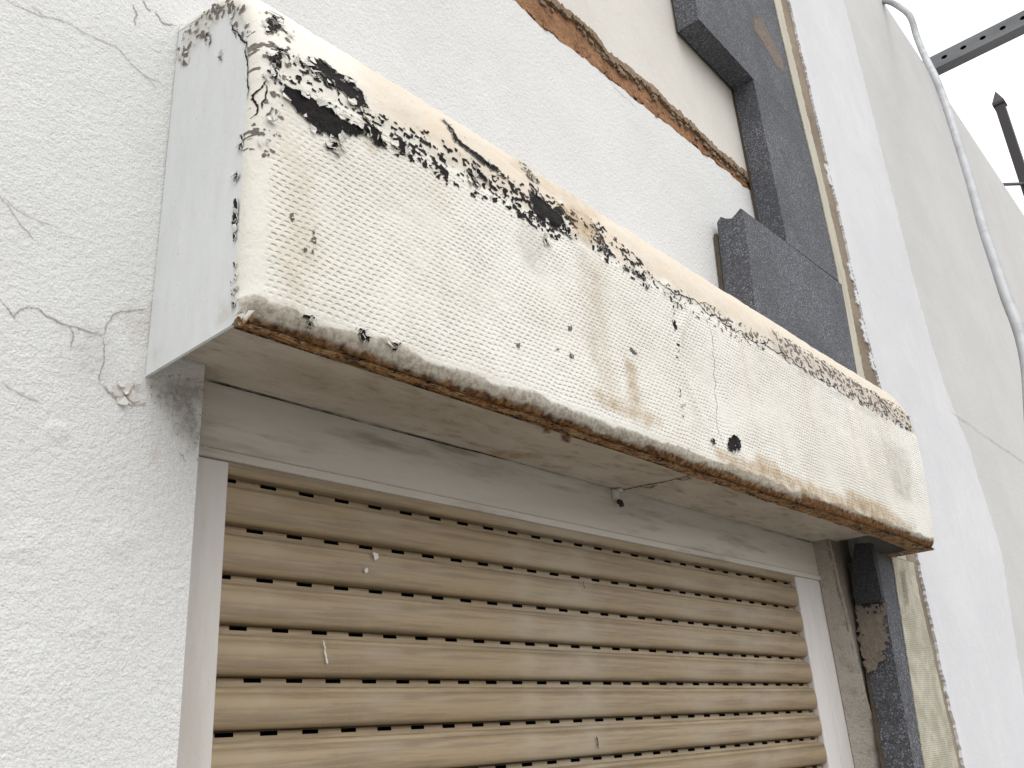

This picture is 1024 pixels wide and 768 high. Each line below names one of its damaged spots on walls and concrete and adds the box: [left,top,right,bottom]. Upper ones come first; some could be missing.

crack [0,196,51,240]
peeling [177,0,911,431]
crack [1,300,146,380]
spalling [103,380,146,406]
peeling [710,433,742,454]